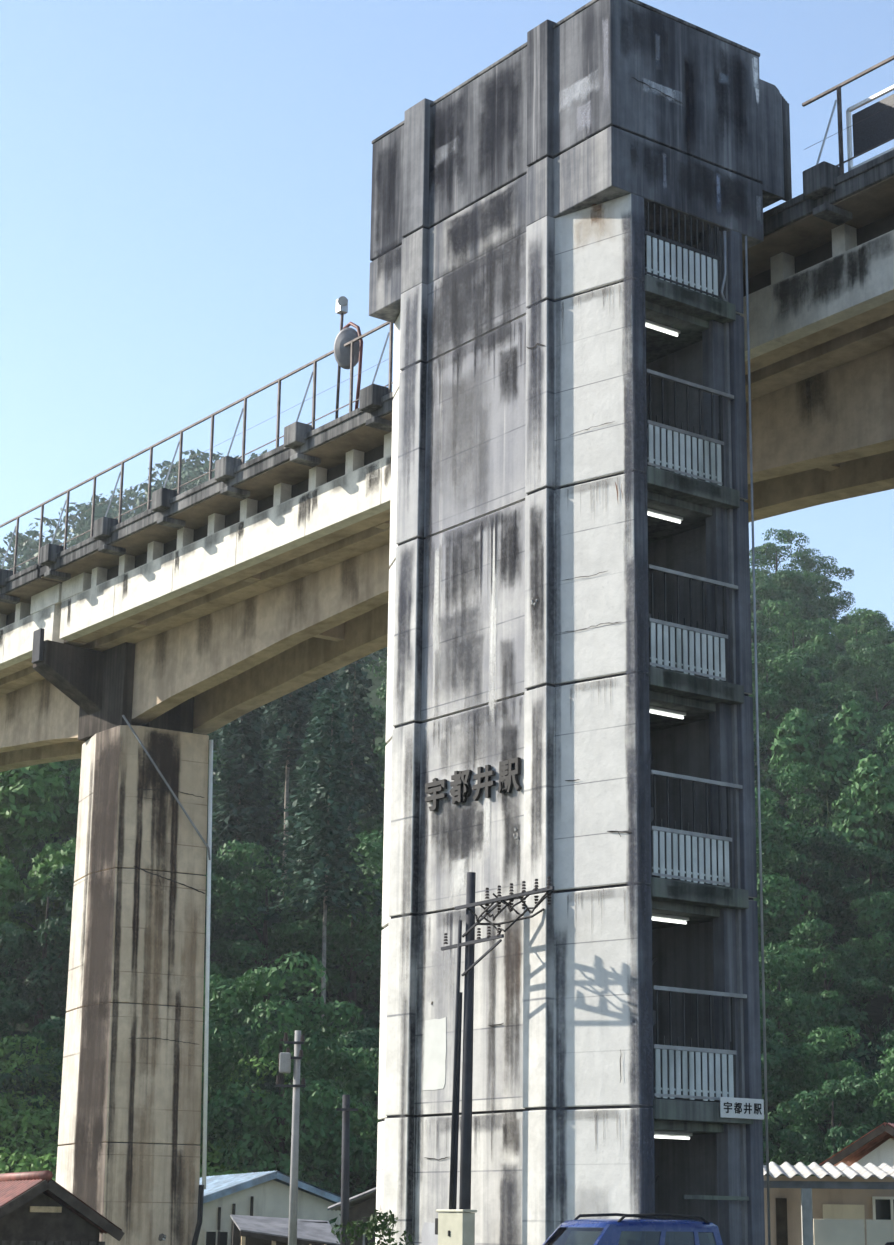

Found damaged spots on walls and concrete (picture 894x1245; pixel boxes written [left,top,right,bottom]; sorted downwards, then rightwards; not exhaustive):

water stain [622,216,645,344]
water stain [776,240,890,314]
water stain [298,490,317,521]
water stain [369,457,391,486]
water stain [398,185,560,710]
water stain [624,373,647,504]
water stain [625,559,651,943]
water stain [73,732,180,1213]
water stain [171,993,182,1235]
water stain [405,754,519,1245]
water stain [532,707,566,1224]
water stain [629,983,655,1219]